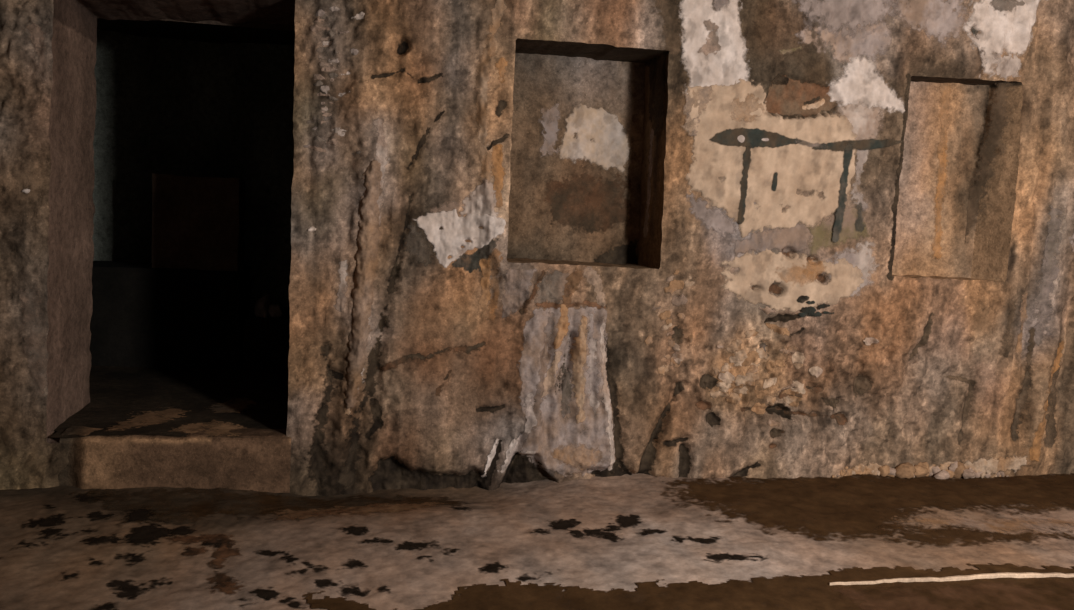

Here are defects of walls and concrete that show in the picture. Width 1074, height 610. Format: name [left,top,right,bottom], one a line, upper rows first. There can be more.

peeling [679,0,749,95]
peeling [964,0,1040,77]
peeling [764,57,905,141]
peeling [415,179,506,268]
spalling [587,462,632,477]